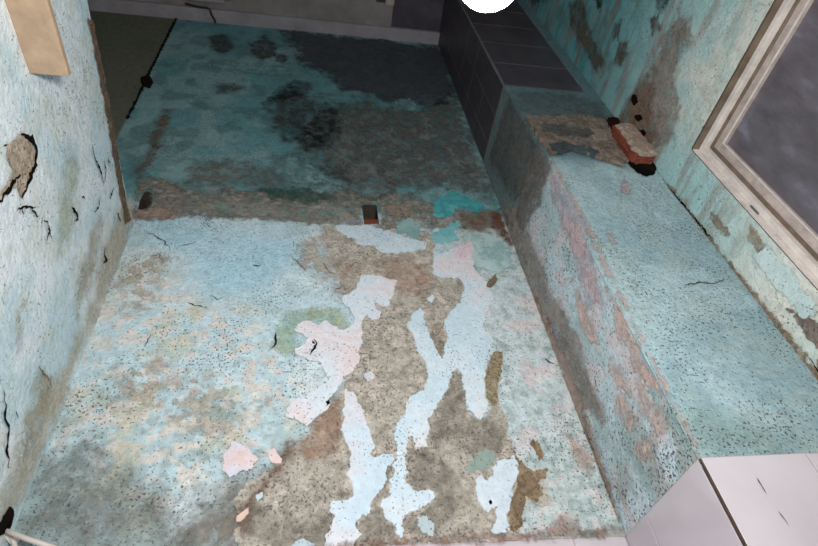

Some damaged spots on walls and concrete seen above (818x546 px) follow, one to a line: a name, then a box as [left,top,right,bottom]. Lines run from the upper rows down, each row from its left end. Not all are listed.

leakage [569,0,603,71]
leakage [613,20,627,66]
leakage [650,0,668,36]
flaking render [0,133,38,202]
peeling [87,18,551,546]
leakage [251,30,619,529]
flaking render [663,180,818,380]
leakage [313,513,335,540]